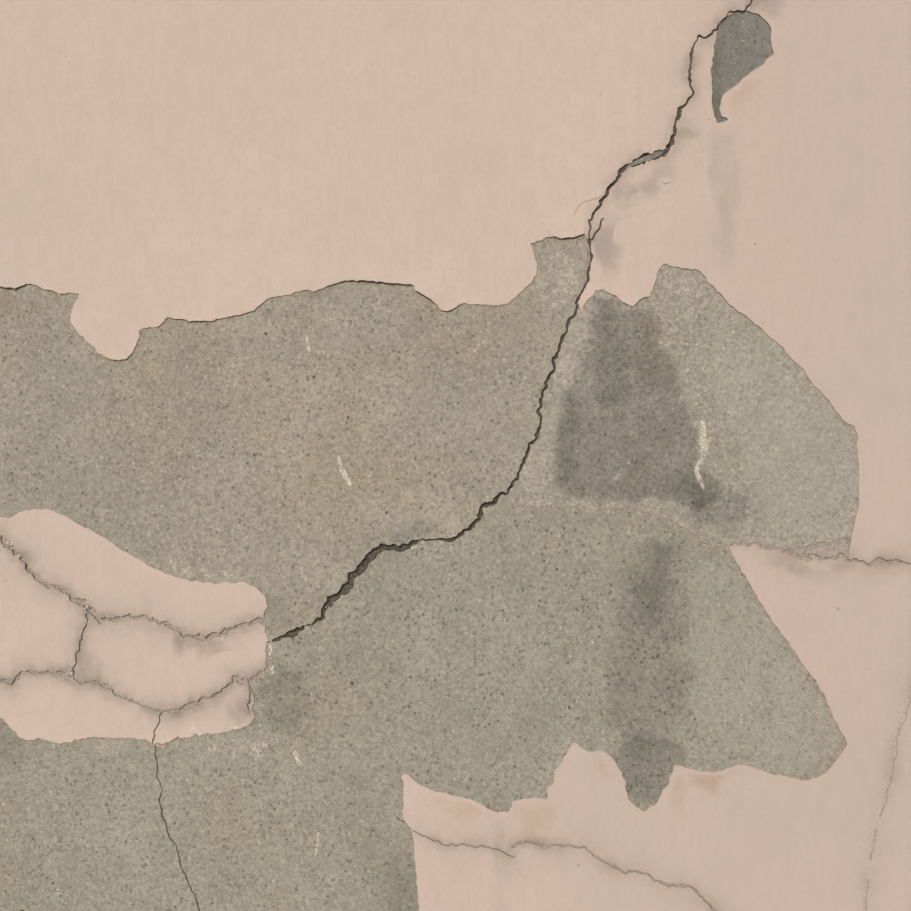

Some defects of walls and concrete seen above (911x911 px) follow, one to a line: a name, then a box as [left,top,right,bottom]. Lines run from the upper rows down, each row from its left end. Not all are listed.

peeling [711,1,773,123]
crack [267,0,911,643]
efflorescence [694,420,708,489]
peeling [0,232,859,911]
crack [0,533,270,911]
crack [396,817,718,911]
crack [862,683,911,911]